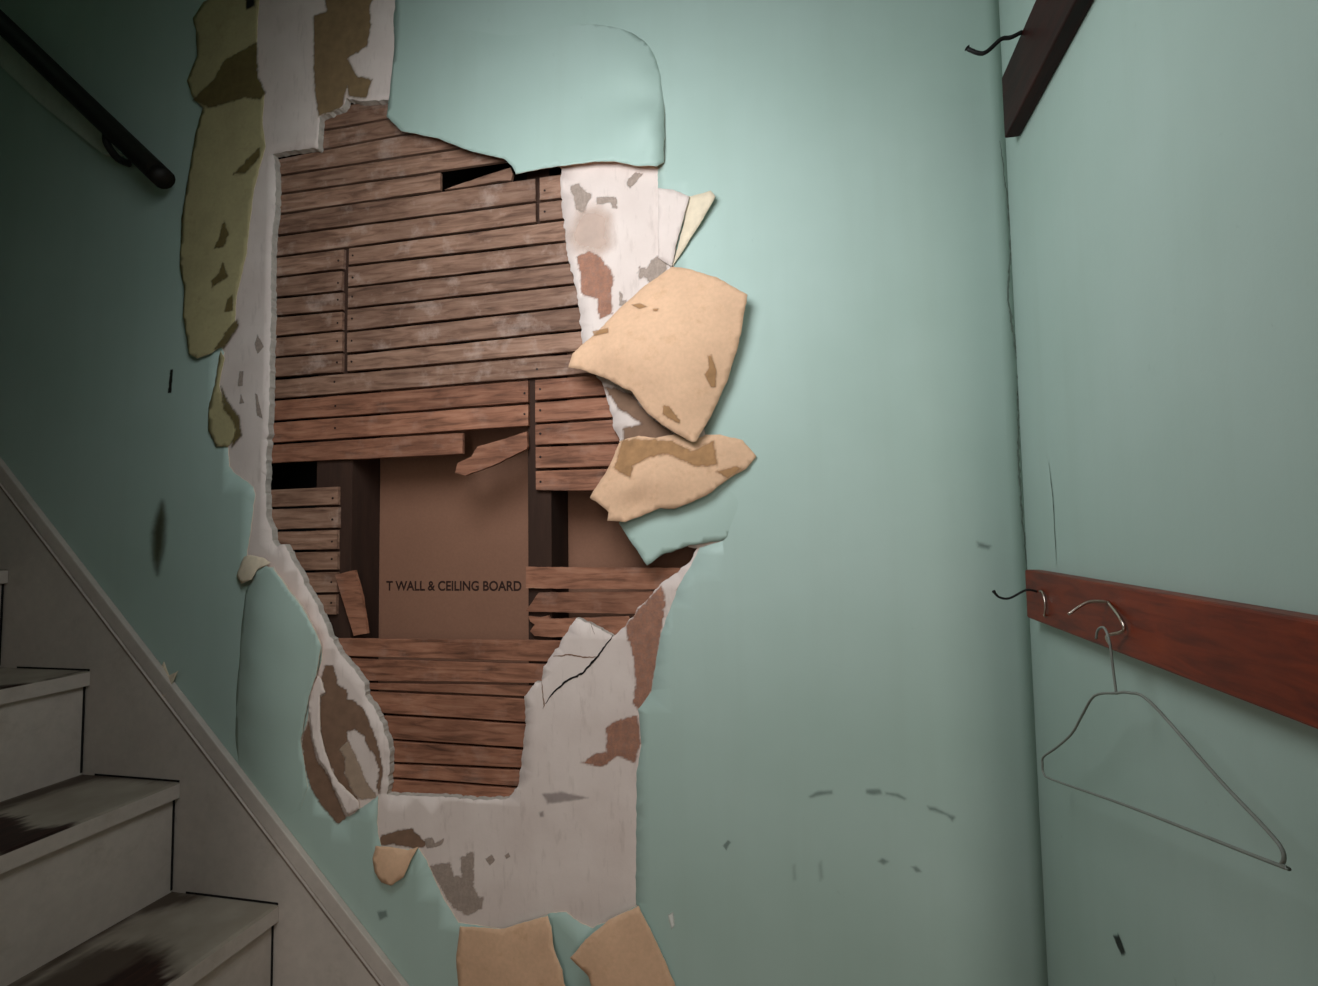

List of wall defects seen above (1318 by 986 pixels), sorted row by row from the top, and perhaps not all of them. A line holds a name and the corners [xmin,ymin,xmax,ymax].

flaking render [180,0,720,986]
crack [541,622,612,708]
peeling [558,162,756,522]